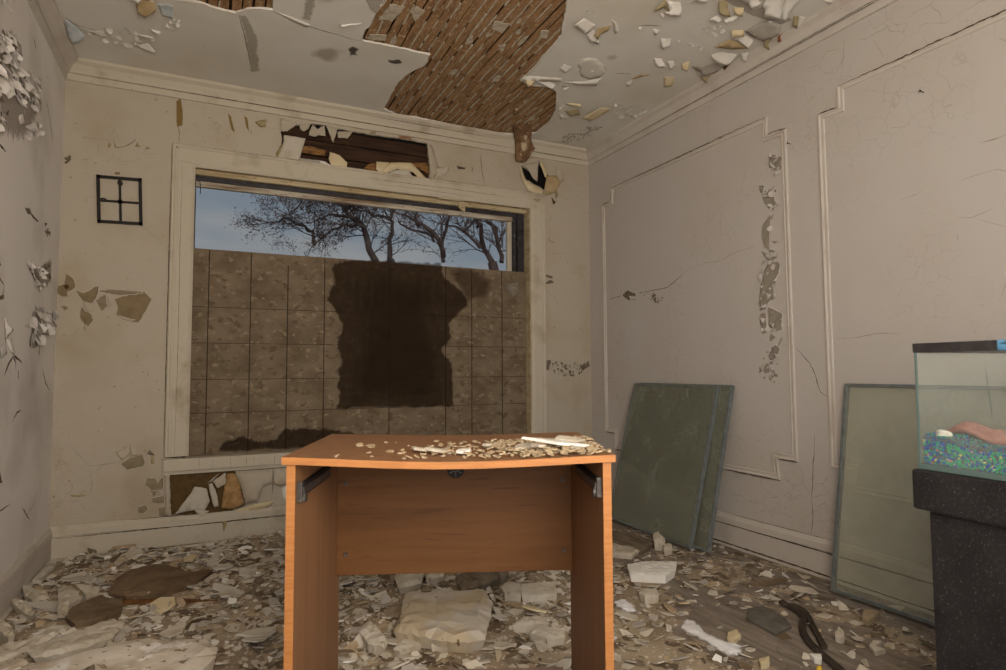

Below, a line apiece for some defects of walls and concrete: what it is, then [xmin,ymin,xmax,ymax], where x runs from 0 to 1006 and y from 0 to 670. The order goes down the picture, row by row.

peeling [0,29,45,140]
flaking render [64,0,276,53]
crack [33,0,505,197]
flaking render [340,0,648,144]
peeling [612,0,806,87]
crack [533,0,1006,165]
hole [522,165,546,190]
crack [602,117,785,205]
peeling [25,261,152,353]
damp [328,260,467,409]
peeling [757,153,783,383]
flaking render [71,444,287,517]